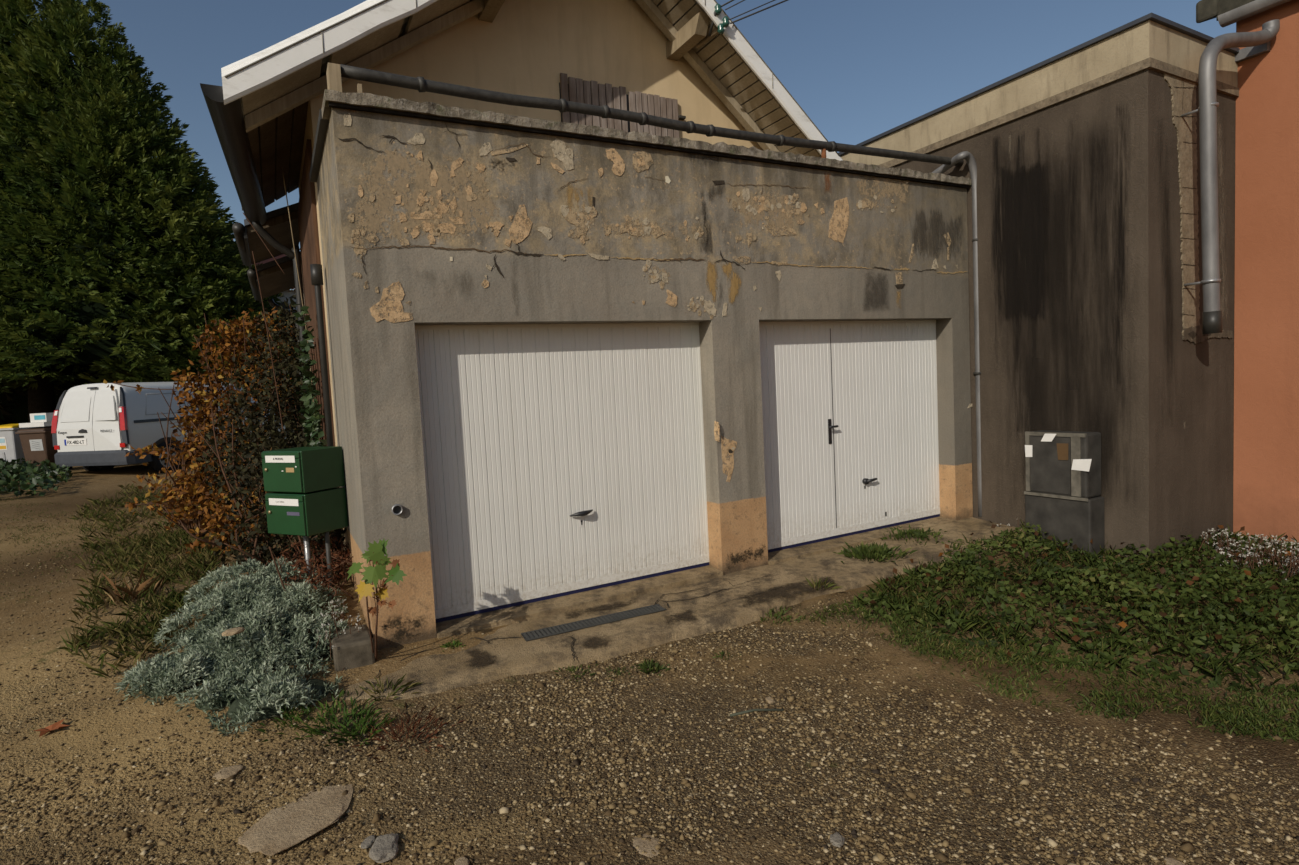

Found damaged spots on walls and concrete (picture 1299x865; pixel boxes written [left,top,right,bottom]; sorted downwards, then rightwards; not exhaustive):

peeling [598,148,654,176]
peeling [348,133,574,323]
peeling [561,197,704,245]
crack [350,210,968,278]
peeling [713,180,897,246]
water stain [993,136,1124,483]
peeling [714,421,737,482]